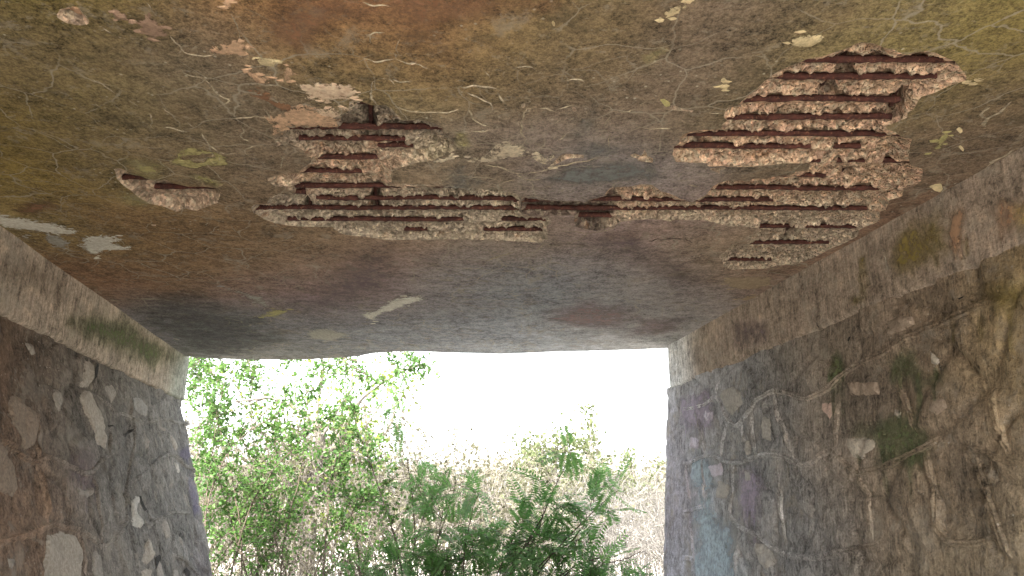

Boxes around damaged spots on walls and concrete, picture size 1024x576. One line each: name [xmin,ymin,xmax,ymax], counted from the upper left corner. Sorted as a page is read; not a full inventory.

spalling [114,168,221,212]
crack [92,35,270,161]
crack [359,32,589,145]
crack [437,101,670,185]
spalling [206,30,984,270]
crack [979,101,1012,127]